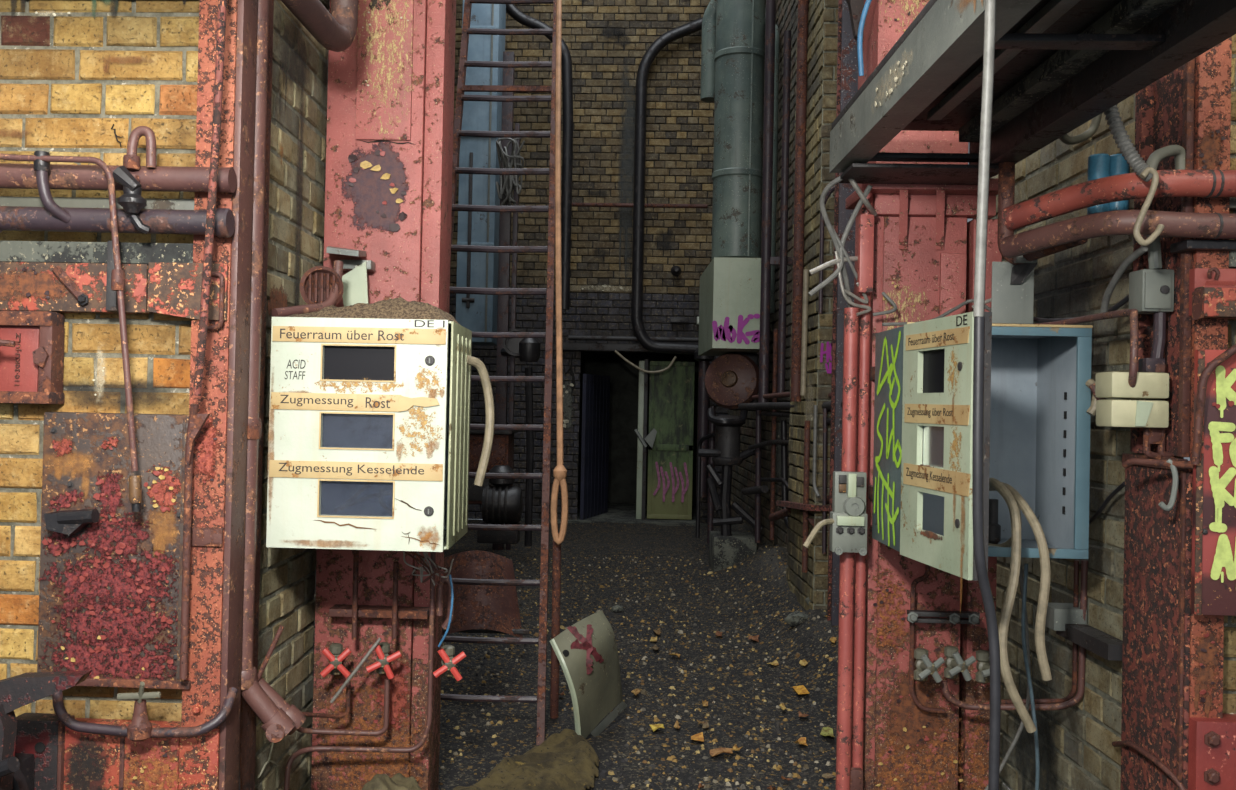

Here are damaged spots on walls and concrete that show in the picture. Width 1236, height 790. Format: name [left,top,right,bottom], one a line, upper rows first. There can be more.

peeling [341,0,418,232]
rust [54,454,90,495]
rust [153,506,176,558]
rust [68,742,195,790]
rust [312,673,431,790]
rust [874,685,990,790]